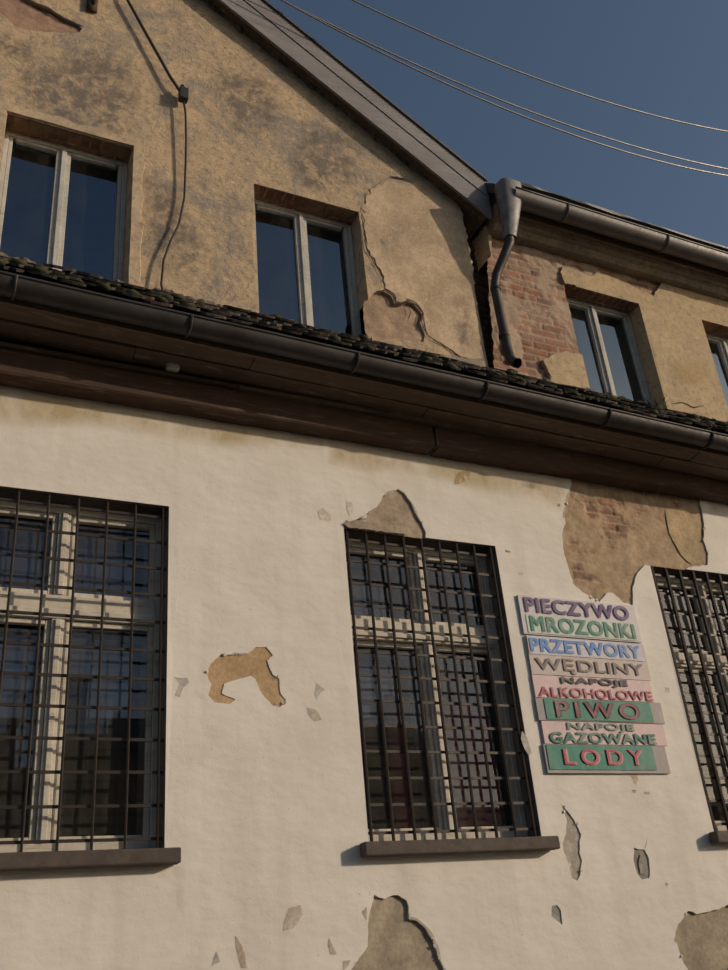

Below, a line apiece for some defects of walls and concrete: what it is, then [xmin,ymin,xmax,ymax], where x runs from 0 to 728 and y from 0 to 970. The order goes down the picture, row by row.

flaking render [0,0,82,33]
flaking render [363,293,424,342]
flaking render [487,238,663,379]
flaking render [344,489,425,539]
flaking render [558,479,707,605]
peeling [207,647,286,707]
peeling [559,806,583,880]
peeling [634,841,649,879]
flaking render [328,895,446,970]
flaking render [674,905,728,970]